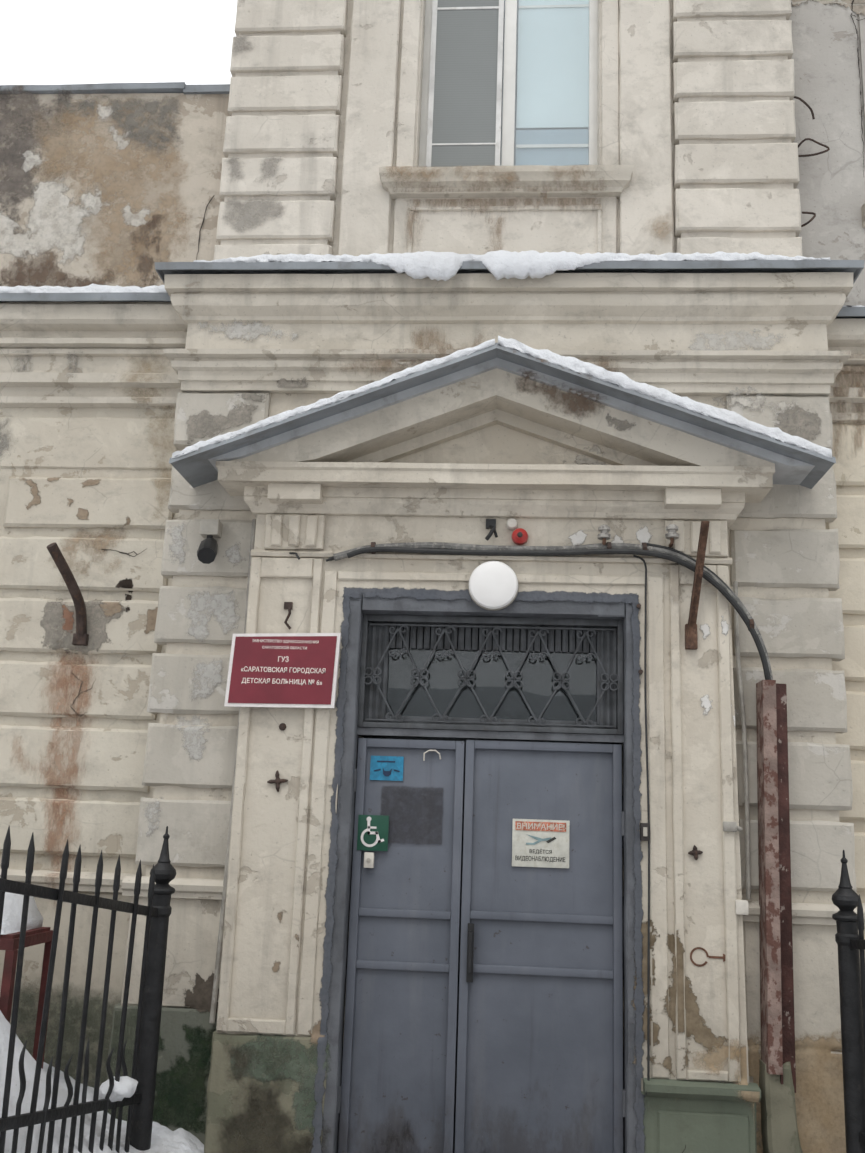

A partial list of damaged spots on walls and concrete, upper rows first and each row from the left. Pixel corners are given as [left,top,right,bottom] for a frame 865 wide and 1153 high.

peeling [23,151,42,172]
peeling [0,178,110,264]
peeling [123,203,150,227]
flaking render [186,393,265,446]
flaking render [715,386,821,440]
peeling [22,477,60,509]
peeling [68,499,89,520]
flaking render [40,578,133,654]
flaking render [144,607,158,634]
rust [48,659,88,872]
flaking render [629,919,741,1076]
leakage [221,1035,331,1153]